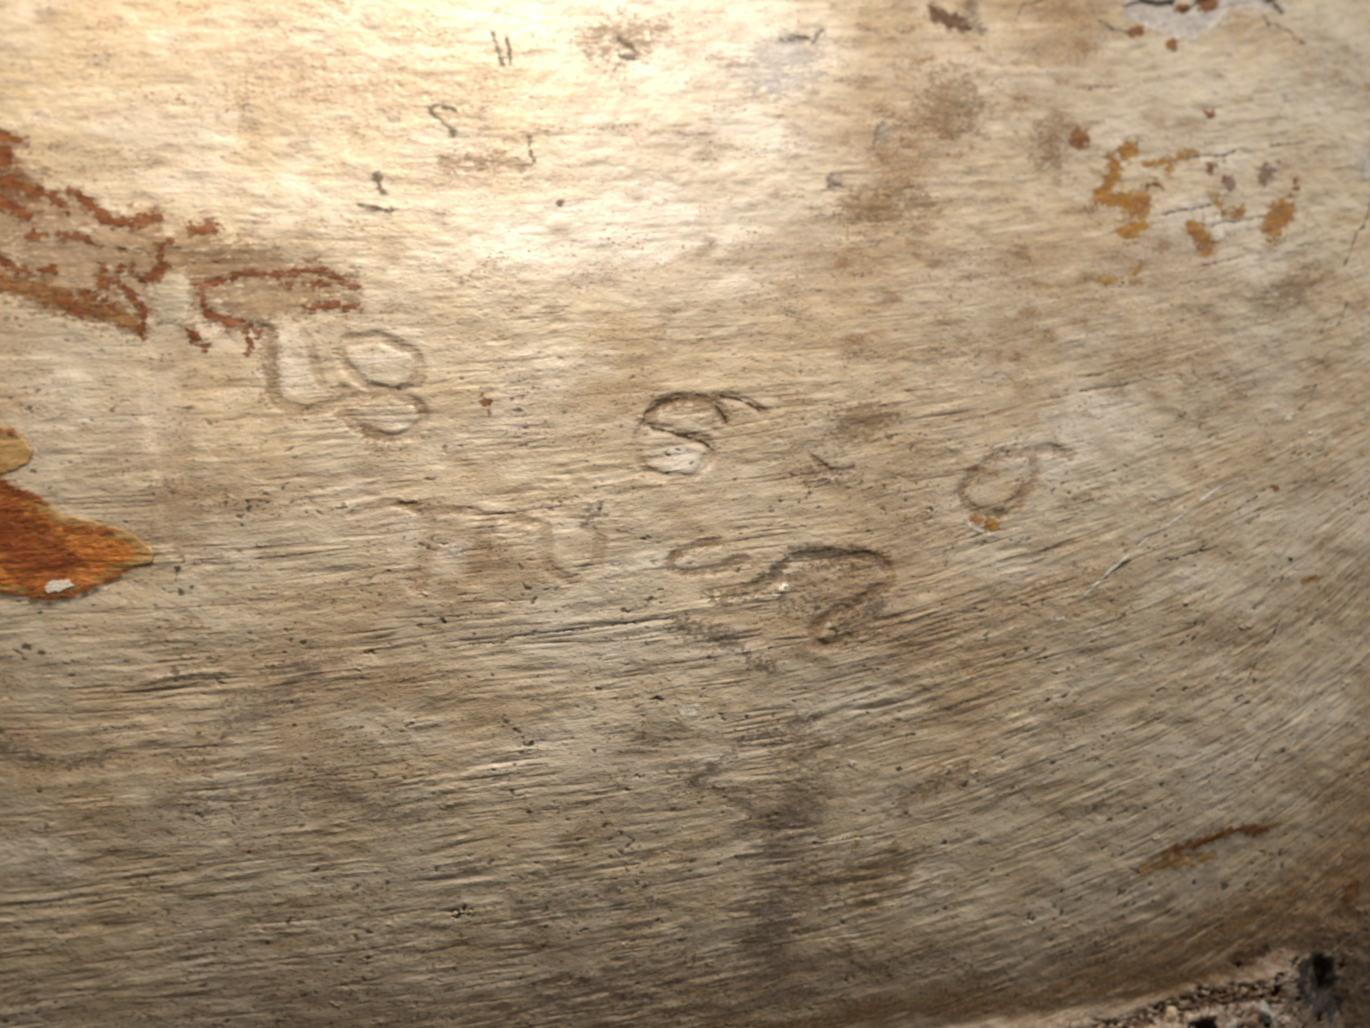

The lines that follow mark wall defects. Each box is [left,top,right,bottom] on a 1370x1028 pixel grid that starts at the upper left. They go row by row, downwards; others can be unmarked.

spalling [1098,0,1283,51]
rust [1069,124,1090,150]
rust [0,129,220,340]
rust [185,266,364,357]
rust [1094,261,1147,286]
rust [1088,137,1301,260]
rust [0,427,155,600]
rust [1140,818,1280,876]